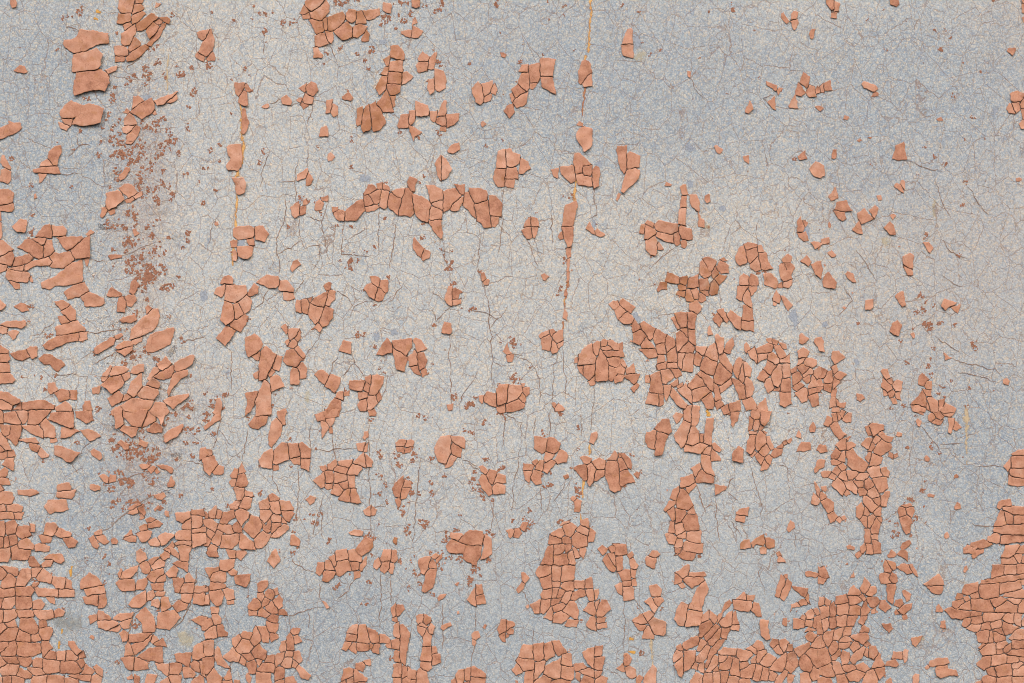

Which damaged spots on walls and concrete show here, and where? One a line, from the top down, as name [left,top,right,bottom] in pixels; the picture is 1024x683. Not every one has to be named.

peeling [262,0,459,141]
rust [103,135,181,317]
crack [252,149,402,316]
peeling [290,143,531,239]
rust [111,346,160,367]
peeling [0,155,313,683]
peeling [214,260,384,517]
crack [305,332,388,526]
crack [432,189,595,528]
crack [697,462,790,540]
peeling [512,182,1024,683]
crack [935,336,1001,382]